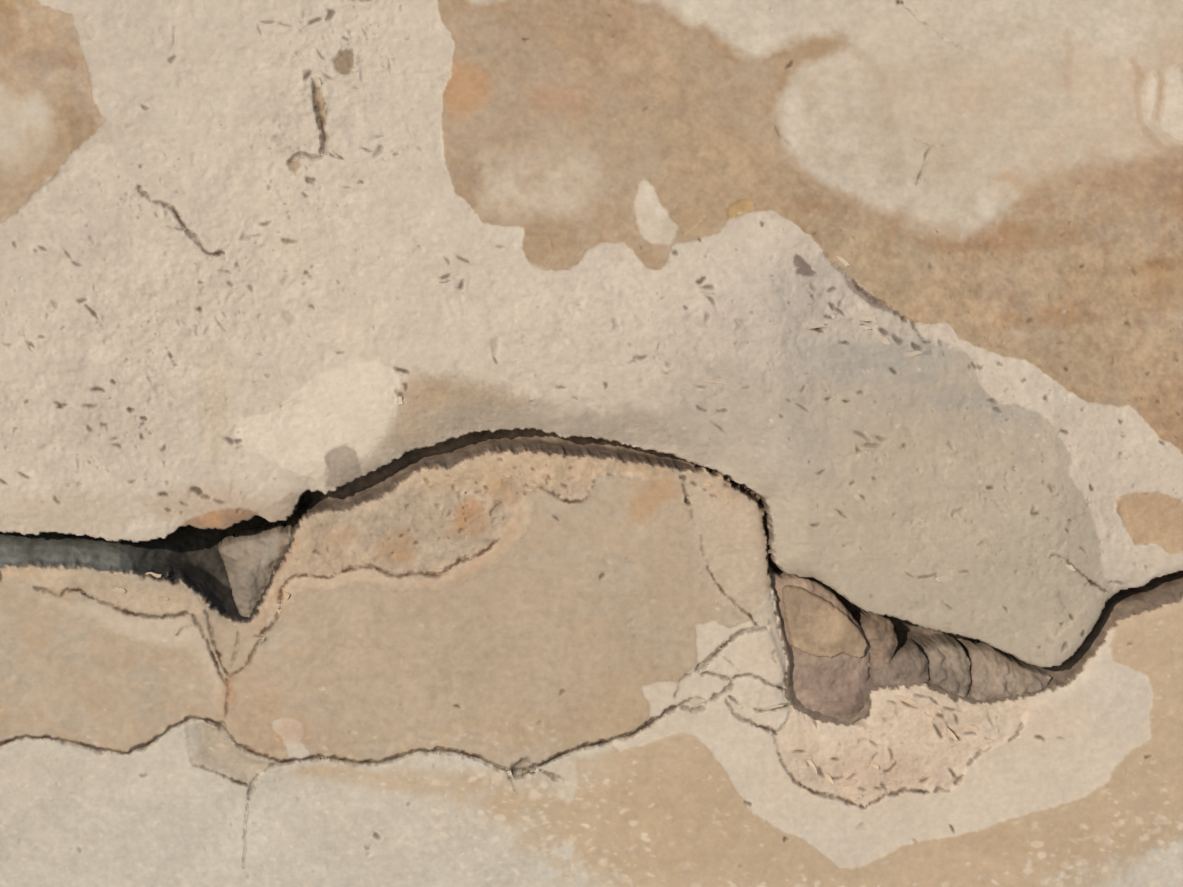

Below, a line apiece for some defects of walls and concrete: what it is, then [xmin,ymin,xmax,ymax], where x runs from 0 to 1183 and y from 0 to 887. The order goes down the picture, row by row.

damp [0,0,105,222]
flaking render [0,0,911,541]
damp [438,0,1183,453]
peeling [1140,62,1183,146]
flaking render [0,567,228,711]
flaking render [0,721,311,812]
flaking render [268,452,654,626]
crack [0,427,1183,869]
flaking render [610,473,1155,871]
flaking render [915,321,1183,593]